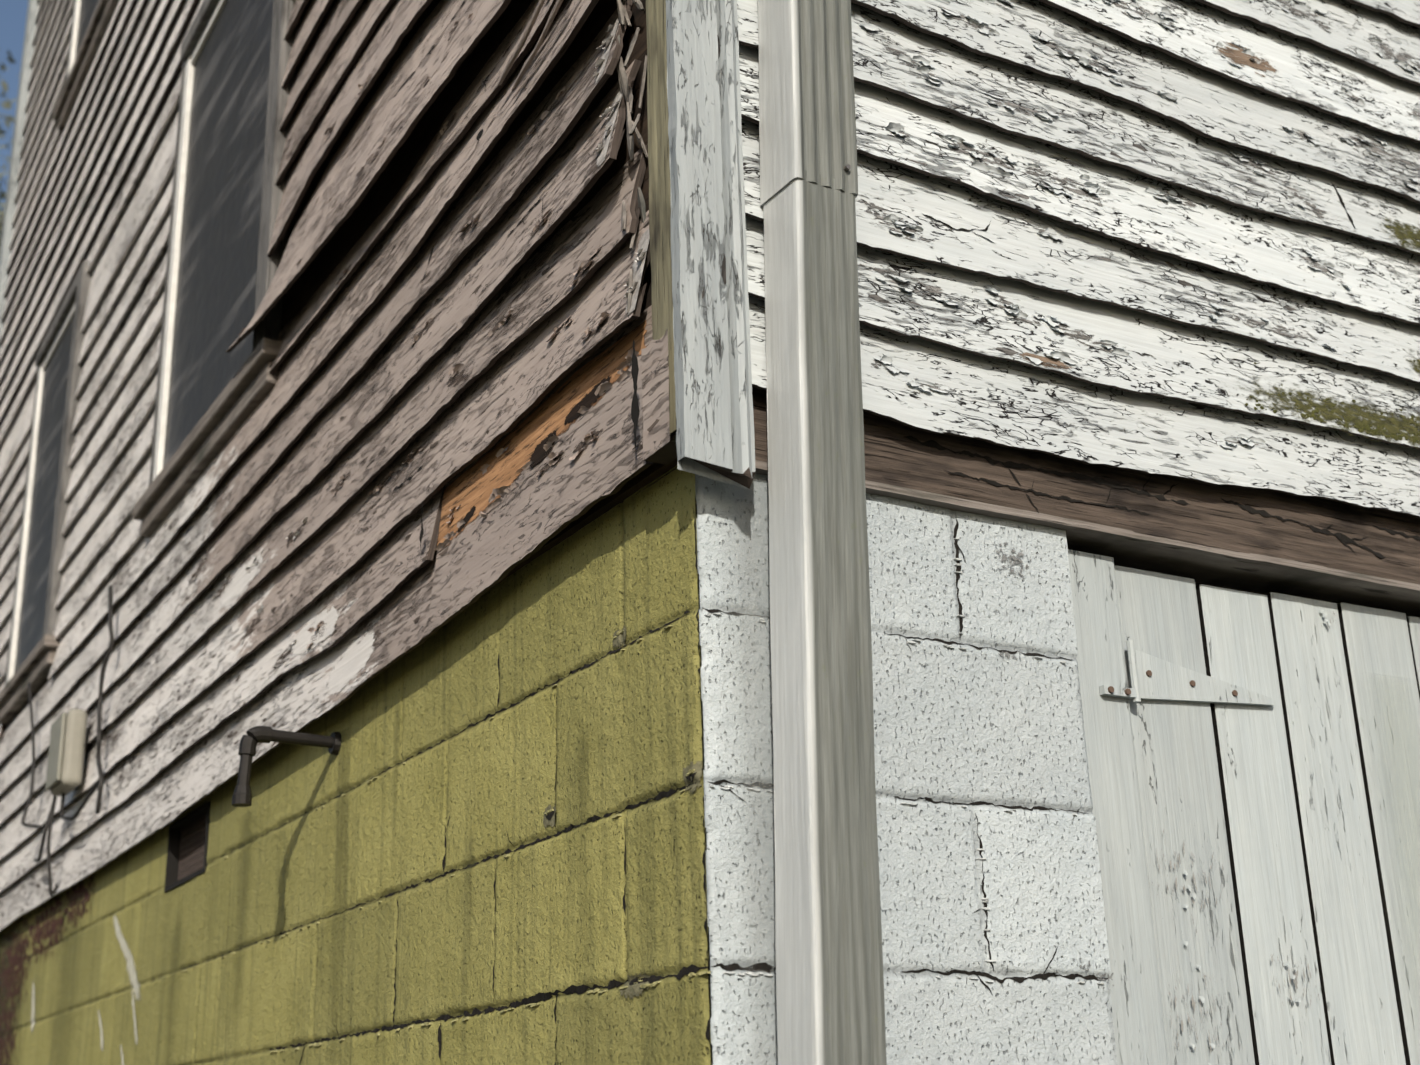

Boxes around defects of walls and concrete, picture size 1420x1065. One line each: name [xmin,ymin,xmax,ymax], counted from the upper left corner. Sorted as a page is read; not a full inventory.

peeling [1211,39,1279,77]
peeling [934,131,1112,206]
peeling [856,195,932,248]
peeling [984,287,1130,371]
peeling [1209,303,1336,349]
peeling [434,320,647,551]
crack [905,436,1420,558]
peeling [211,552,263,612]
crack [886,519,1070,664]
peeling [272,605,340,670]
peeling [327,630,376,695]
crack [894,796,1108,993]